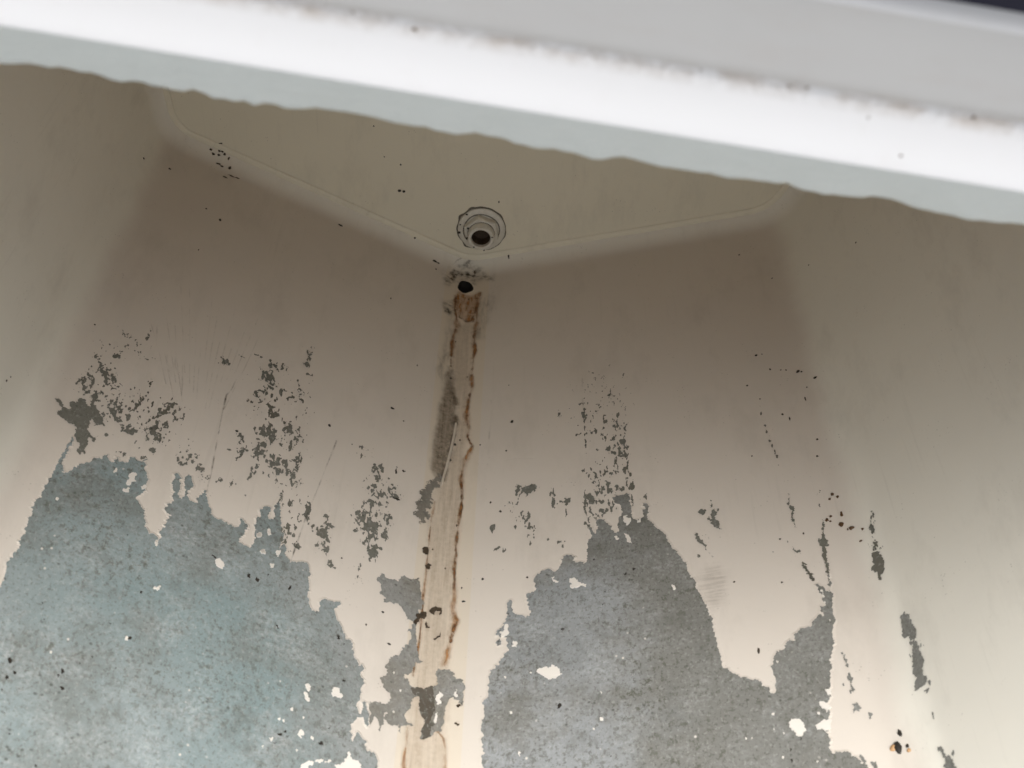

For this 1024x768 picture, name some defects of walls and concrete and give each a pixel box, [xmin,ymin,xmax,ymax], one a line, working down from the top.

rust [450,293,479,421]
leakage [433,372,456,477]
peeling [0,330,465,768]
rust [445,474,463,662]
peeling [478,365,878,768]
peeling [900,611,931,693]
rust [890,729,911,754]